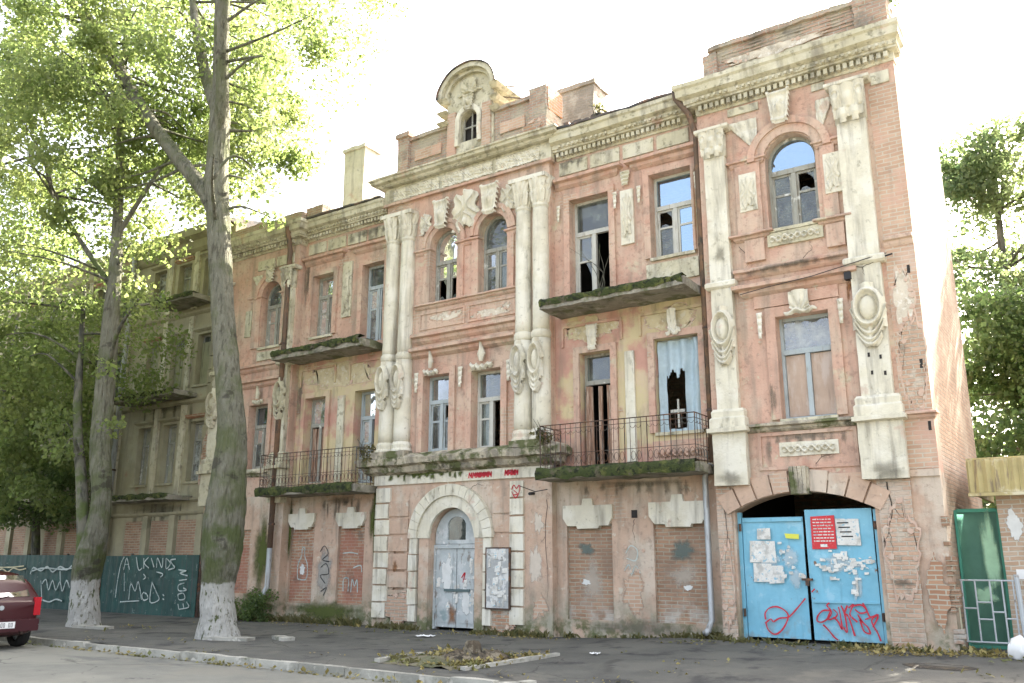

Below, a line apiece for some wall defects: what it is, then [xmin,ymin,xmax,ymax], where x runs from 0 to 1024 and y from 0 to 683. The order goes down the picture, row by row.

flaking render [891,264,932,430]
leakage [389,471,462,481]
flaking render [721,540,736,631]
flaking render [882,497,967,644]